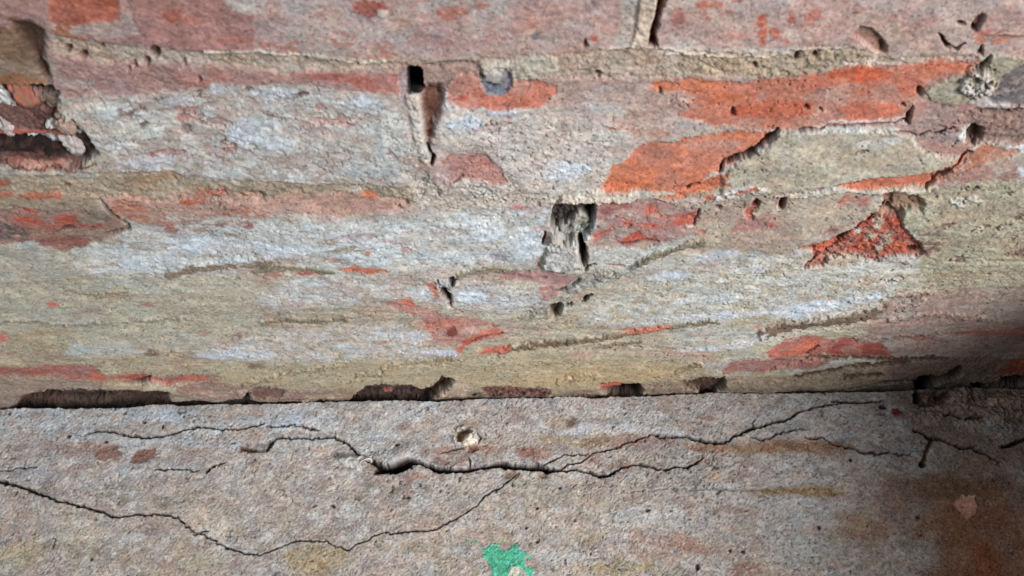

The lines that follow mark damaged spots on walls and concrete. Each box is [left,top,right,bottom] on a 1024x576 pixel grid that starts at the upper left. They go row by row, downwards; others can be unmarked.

peeling [0,0,1019,374]
crack [0,378,1024,556]